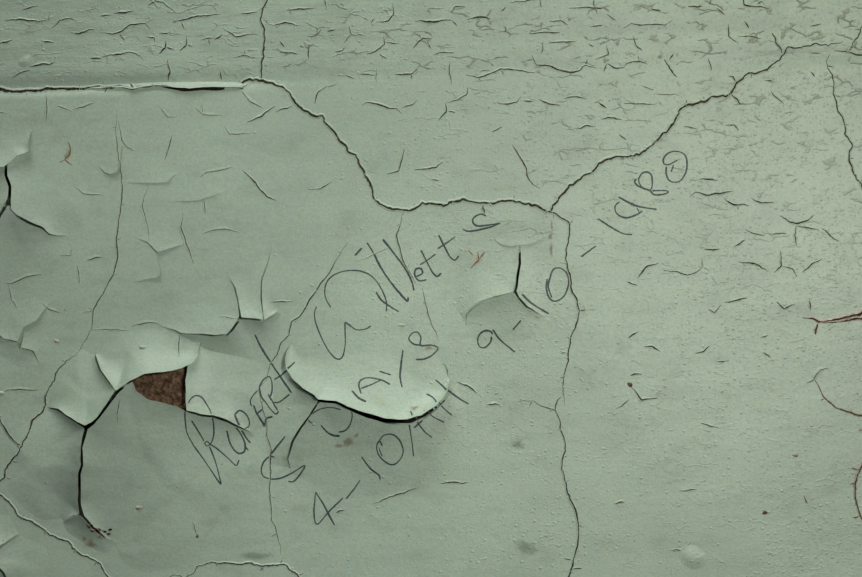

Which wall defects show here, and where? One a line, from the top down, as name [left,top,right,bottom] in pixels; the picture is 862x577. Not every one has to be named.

crack [0,0,220,121]
crack [158,105,177,160]
peeling [0,111,90,367]
crack [0,119,181,577]
crack [178,201,240,264]
peeling [4,244,467,572]
peeling [454,229,555,343]
crack [194,0,862,577]
peeling [0,513,50,577]